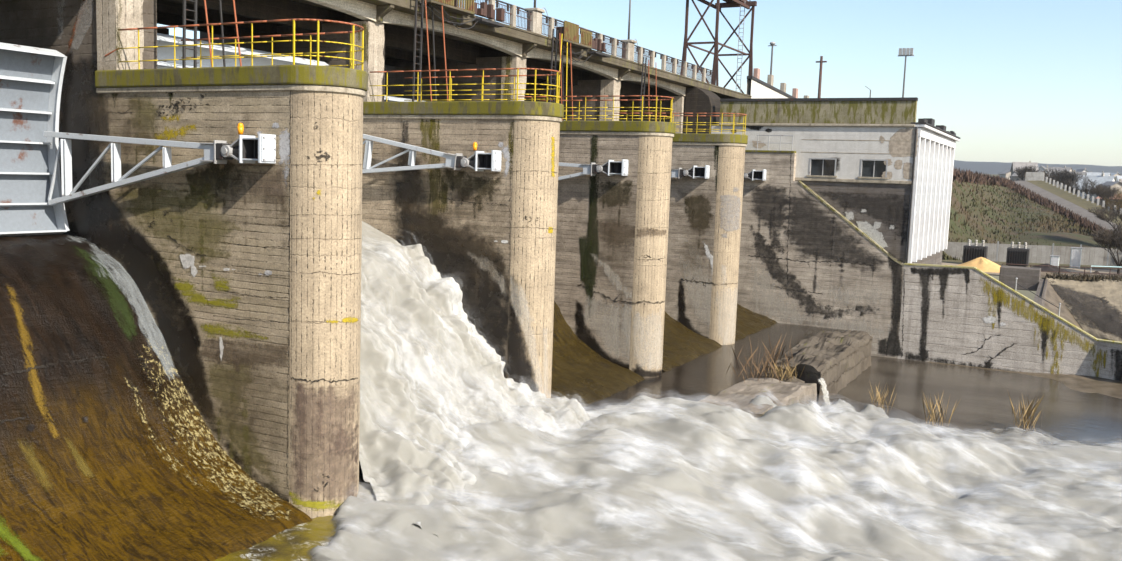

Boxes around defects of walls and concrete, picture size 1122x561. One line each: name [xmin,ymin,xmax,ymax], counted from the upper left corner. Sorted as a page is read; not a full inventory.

damp [20,0,358,520]
damp [750,184,1009,371]
crack [964,335,1015,365]
damp [1034,311,1064,374]
damp [1049,282,1122,381]